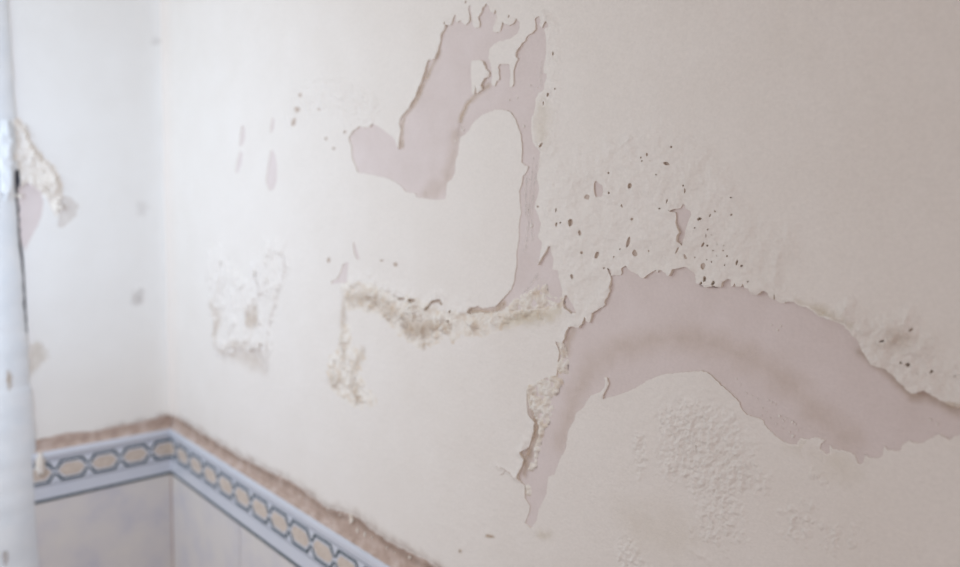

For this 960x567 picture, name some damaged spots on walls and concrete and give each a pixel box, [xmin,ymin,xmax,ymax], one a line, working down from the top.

peeling [0,117,79,252]
peeling [326,4,960,528]